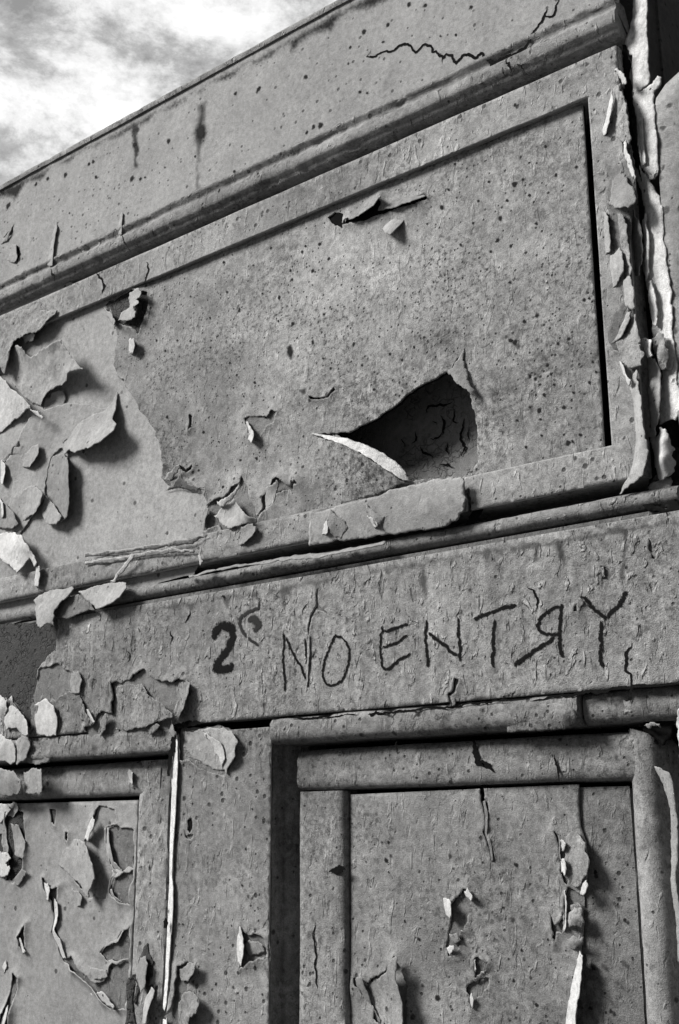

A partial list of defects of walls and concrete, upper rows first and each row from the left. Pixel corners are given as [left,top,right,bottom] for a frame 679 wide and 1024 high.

crack [366,0,559,66]
peeling [329,194,427,235]
peeling [603,0,679,513]
peeling [0,282,467,1024]
crack [472,739,494,862]
peeling [443,887,473,956]
peeling [468,957,489,1009]
peeling [552,831,590,1024]